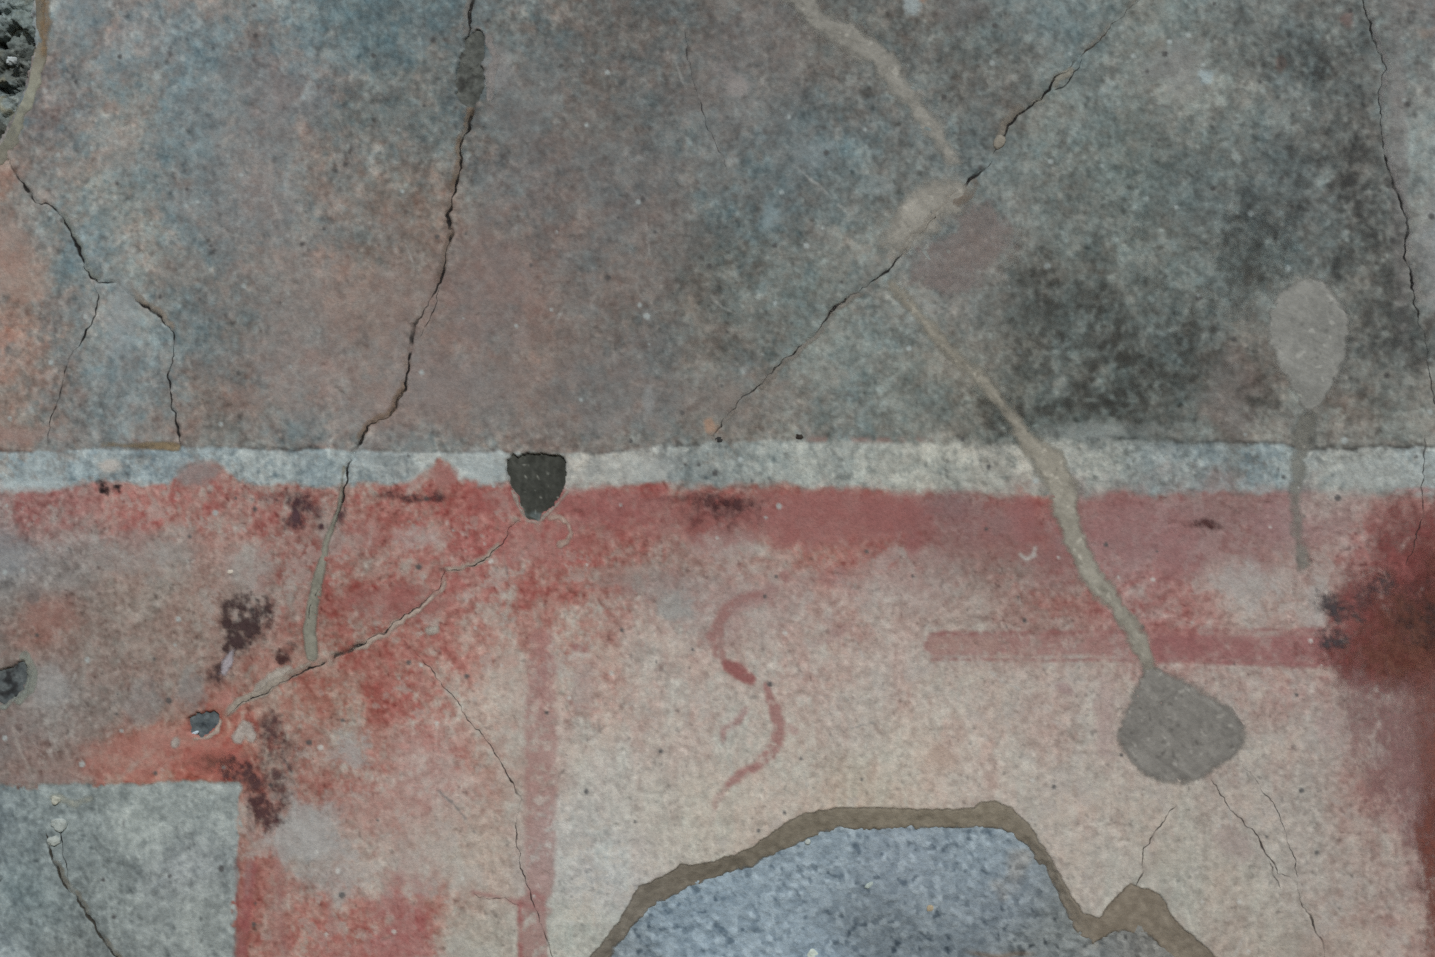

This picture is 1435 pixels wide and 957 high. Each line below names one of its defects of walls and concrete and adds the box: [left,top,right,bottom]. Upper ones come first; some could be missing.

crack [464,0,474,33]
crack [719,11,1126,428]
crack [1363,0,1435,403]
crack [17,176,180,438]
crack [335,107,474,523]
spalling [510,477,568,523]
spalling [0,652,37,709]
spalling [171,711,256,748]
crack [227,517,518,714]
crack [46,835,121,957]
spalling [611,825,1174,957]